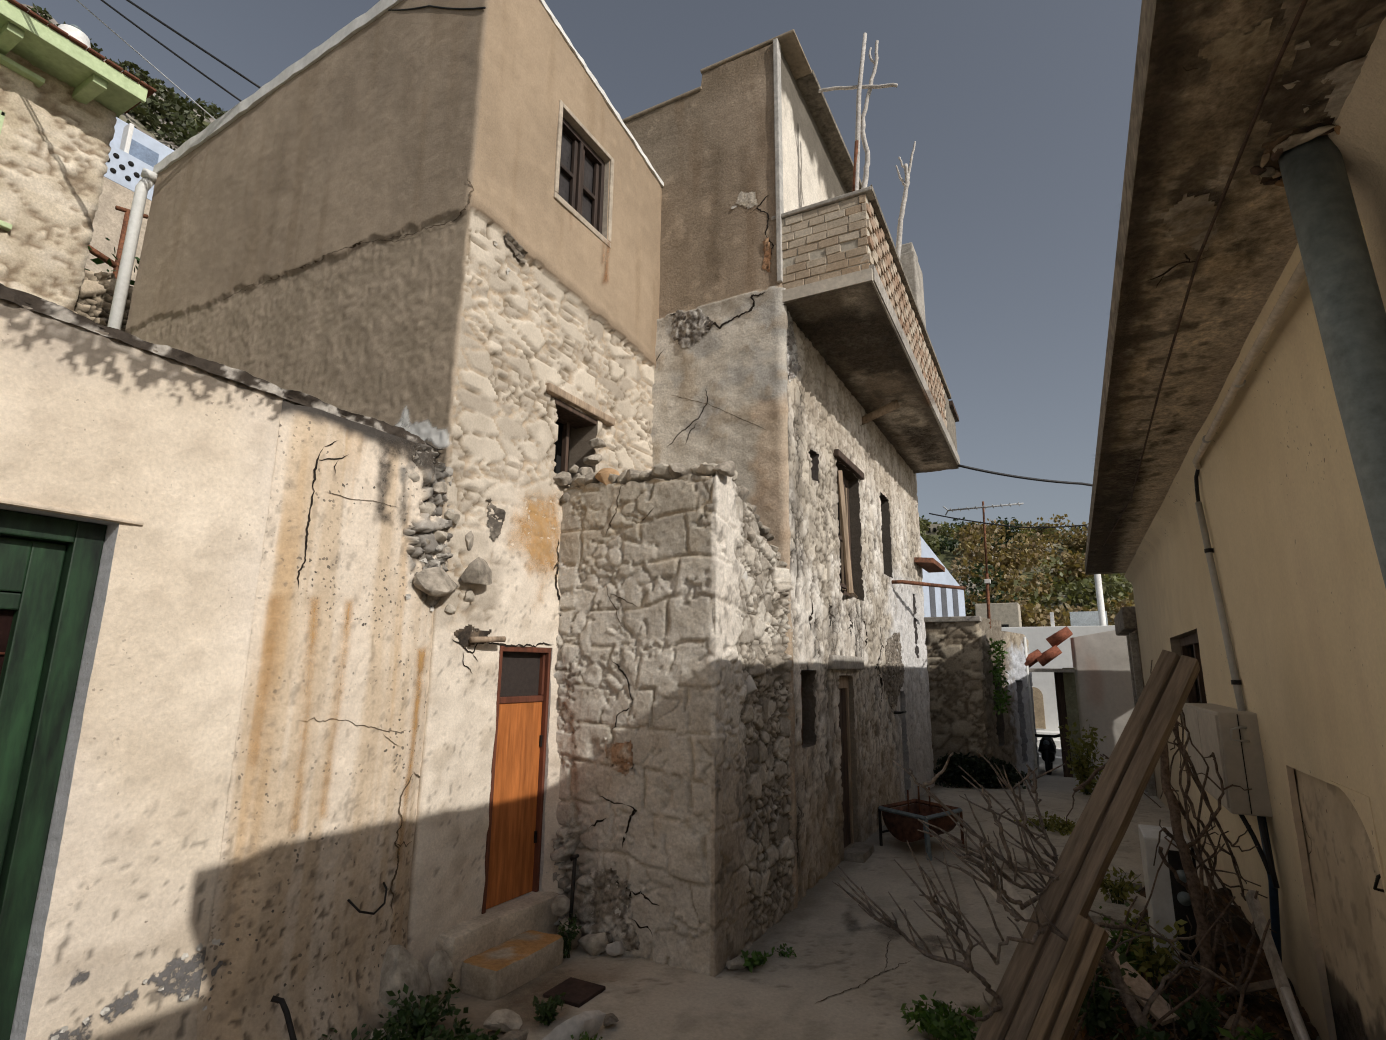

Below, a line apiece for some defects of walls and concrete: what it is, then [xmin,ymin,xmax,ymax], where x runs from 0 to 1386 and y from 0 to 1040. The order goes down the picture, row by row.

peeling [1198,0,1386,187]
crack [224,179,474,300]
crack [707,196,774,329]
crack [668,390,766,446]
crack [297,441,396,588]
water stain [1092,446,1147,573]
crack [606,586,636,628]
crack [612,662,634,769]
crack [299,717,420,911]
crack [590,796,637,847]
crack [616,880,659,937]
peeling [49,938,225,1040]